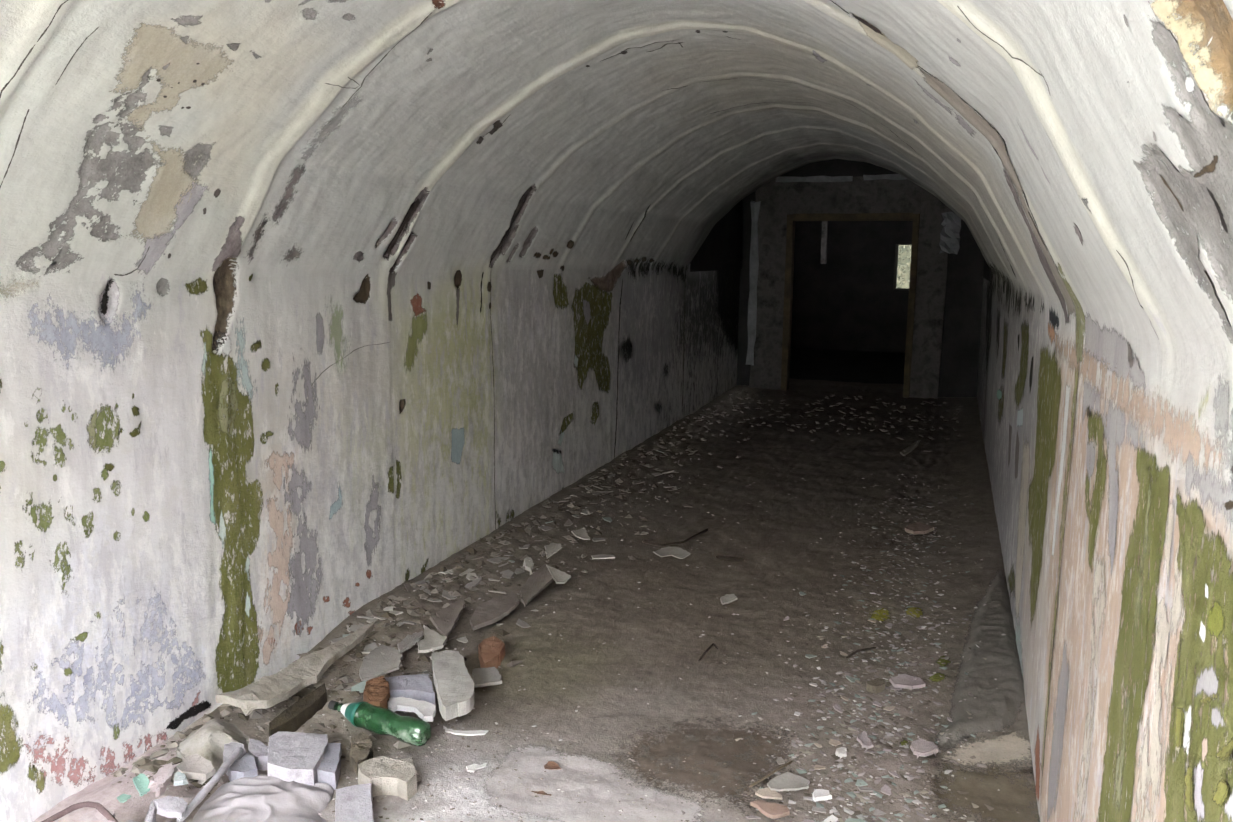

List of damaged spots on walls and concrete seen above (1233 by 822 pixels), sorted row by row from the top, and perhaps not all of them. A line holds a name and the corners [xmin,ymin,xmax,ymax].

crack [0,0,68,98]
crack [56,27,99,84]
spalling [171,15,203,44]
crack [0,109,29,188]
spalling [16,63,205,275]
peeling [28,142,221,371]
spalling [212,97,361,356]
spalling [353,187,430,321]
spalling [489,184,574,279]
crack [830,0,1085,363]
spalling [1133,0,1233,343]
peeling [1185,373,1233,528]